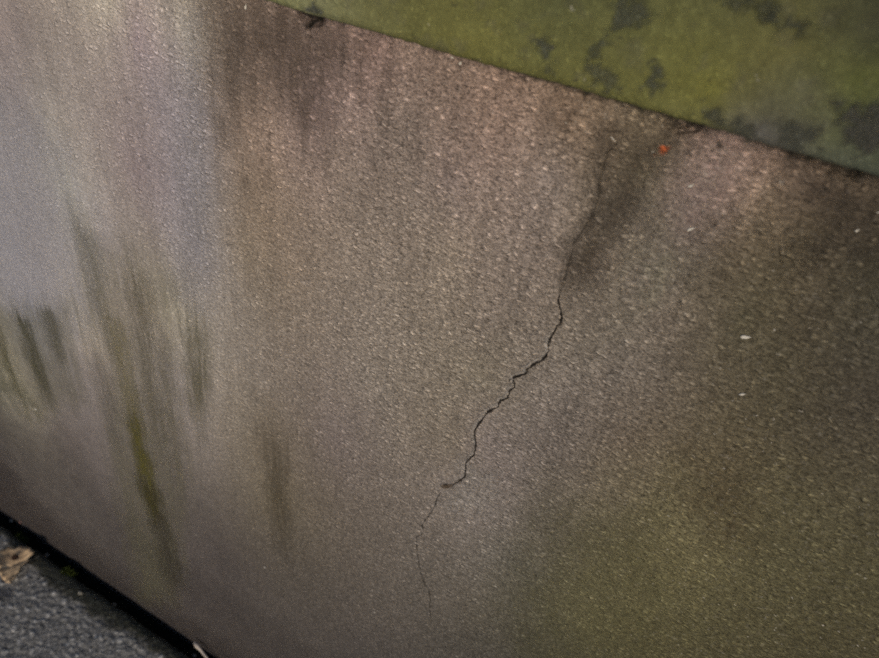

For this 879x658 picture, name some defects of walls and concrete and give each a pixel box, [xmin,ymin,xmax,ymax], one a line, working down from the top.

damp [0,117,84,306]
crack [453,295,563,485]
damp [0,526,188,658]